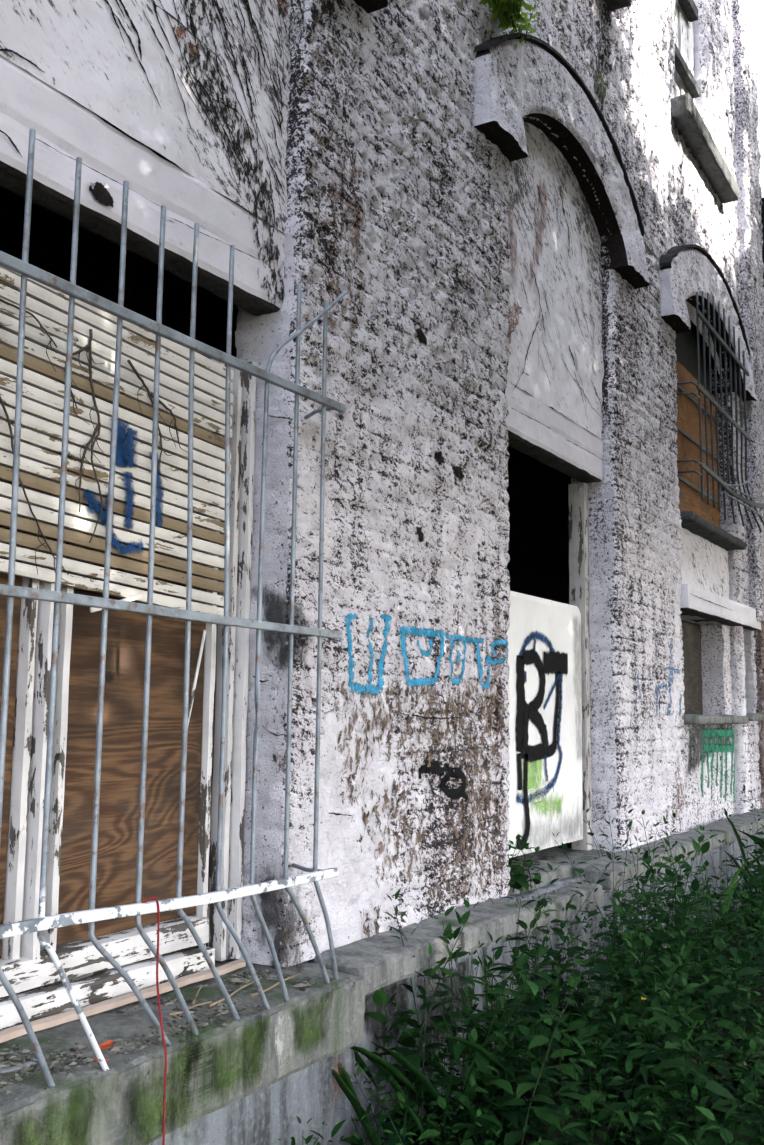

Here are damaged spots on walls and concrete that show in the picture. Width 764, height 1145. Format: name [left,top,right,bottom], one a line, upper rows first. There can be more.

crack [0,48,46,73]
crack [152,0,268,222]
damp [294,992,333,1051]
damp [116,1016,268,1145]
damp [3,1089,95,1145]